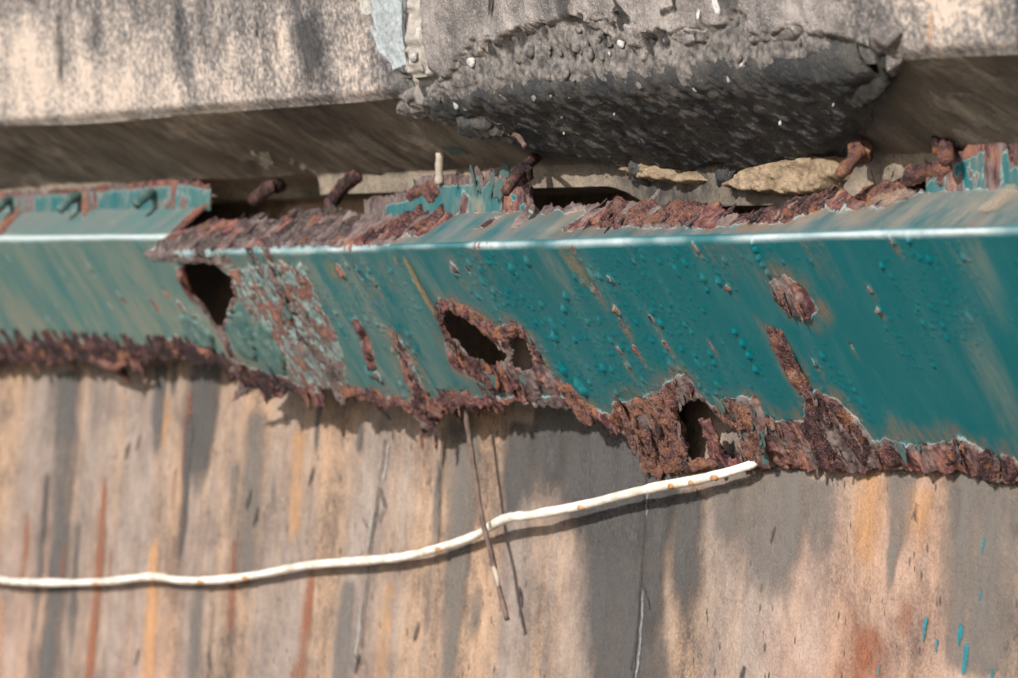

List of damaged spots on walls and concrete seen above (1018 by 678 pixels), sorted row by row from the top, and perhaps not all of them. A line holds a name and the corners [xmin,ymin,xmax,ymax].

spalling [359,0,832,144]
spalling [845,17,904,108]
spalling [619,163,708,185]
spalling [721,156,850,198]
damp [35,370,79,678]
rust [0,329,311,410]
damp [178,363,221,553]
rust [154,203,543,450]
damp [433,420,481,677]
damp [504,400,703,678]
rust [609,377,723,489]
rust [709,323,921,480]